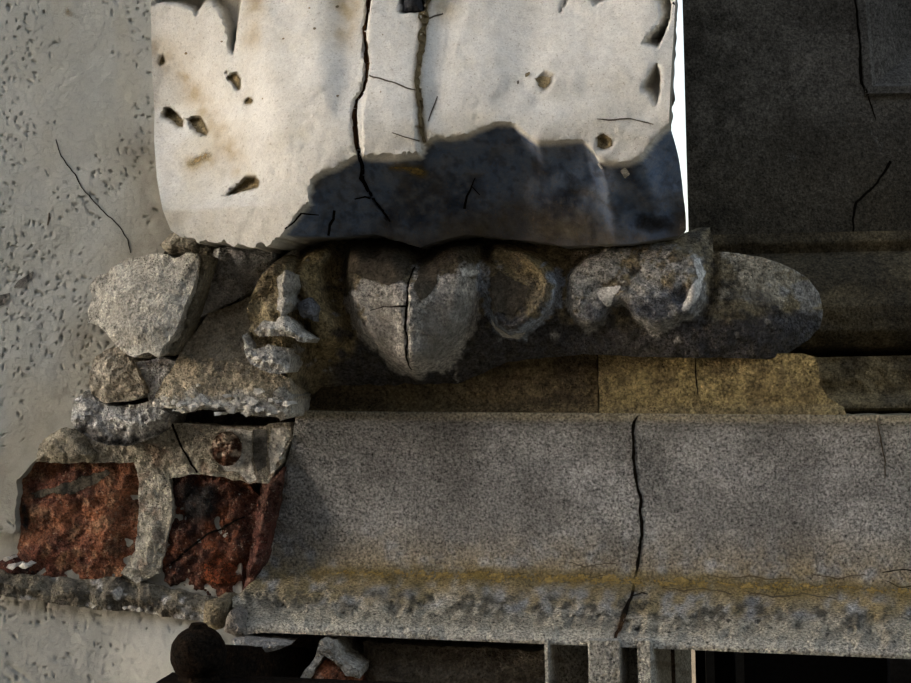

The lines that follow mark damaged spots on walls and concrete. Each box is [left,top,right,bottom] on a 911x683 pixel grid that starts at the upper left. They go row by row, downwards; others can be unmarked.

spalling [403,0,424,13]
peeling [227,74,240,90]
crack [854,0,876,120]
peeling [166,108,208,135]
crack [352,0,443,222]
peeling [597,133,612,149]
crack [56,140,131,253]
peeling [230,178,259,194]
crack [285,210,336,236]
crack [370,267,415,370]
peeling [221,428,257,483]
crack [559,415,911,638]